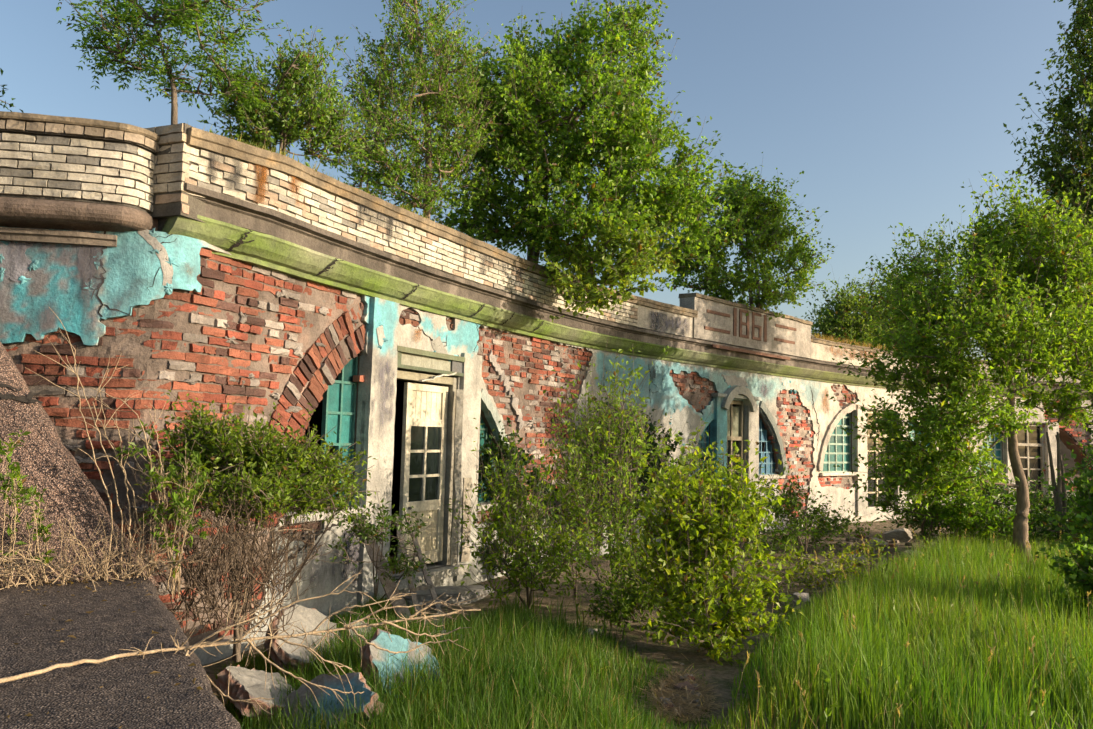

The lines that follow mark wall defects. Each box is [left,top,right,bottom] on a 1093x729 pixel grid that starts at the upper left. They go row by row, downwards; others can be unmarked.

crack [83,231,177,317]
crack [224,230,255,251]
flaking render [399,308,425,327]
crack [0,383,62,404]
flaking render [0,228,388,646]
flaking render [477,326,592,518]
flaking render [669,369,717,452]
flaking render [764,380,858,518]